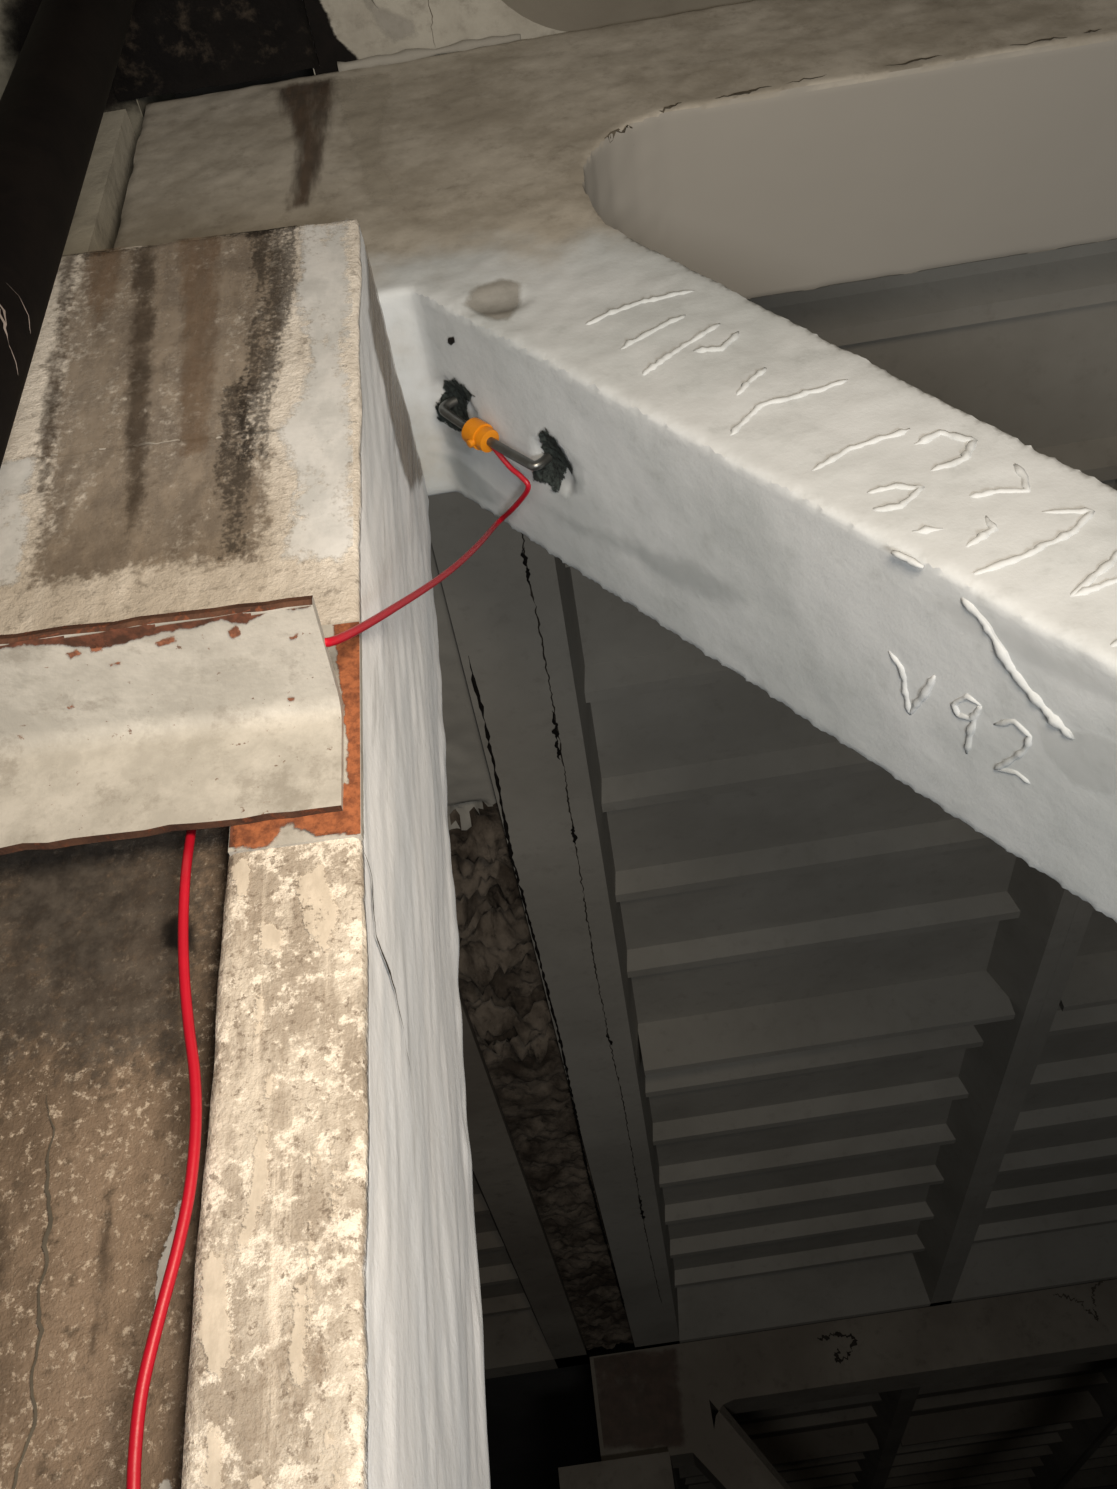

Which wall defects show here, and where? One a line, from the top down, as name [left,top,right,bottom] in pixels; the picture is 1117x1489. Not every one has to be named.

water stain [3,0,42,61]
water stain [281,0,358,205]
water stain [32,231,286,585]
rust [0,609,265,666]
rust [229,622,361,849]
crack [468,656,625,1310]
crack [521,534,662,1302]
crack [12,1096,55,1489]
crack [818,1331,858,1364]